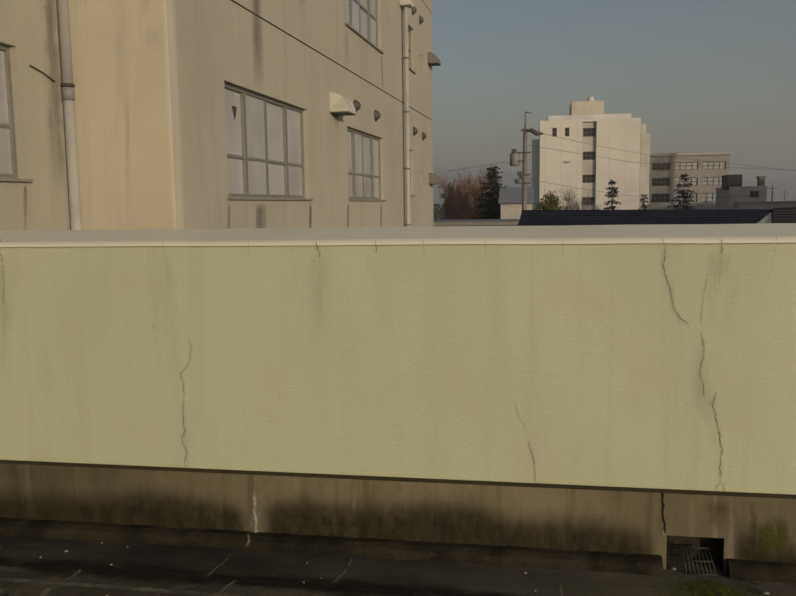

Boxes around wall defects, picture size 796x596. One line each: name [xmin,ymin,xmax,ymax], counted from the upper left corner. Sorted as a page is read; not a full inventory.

leakage [247,476,259,545]